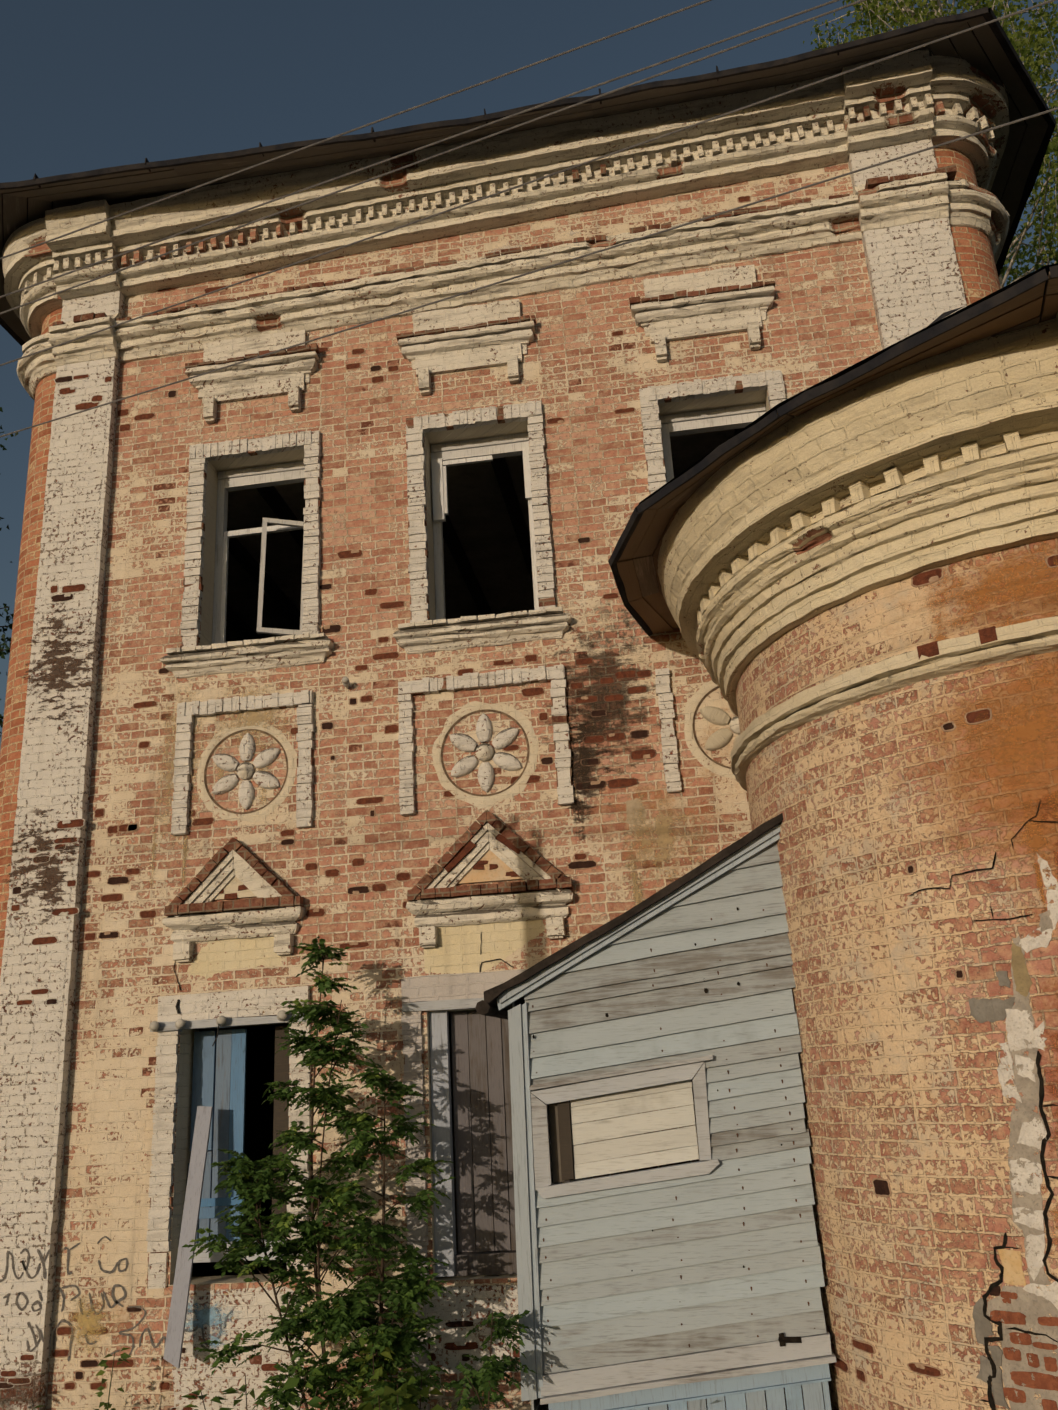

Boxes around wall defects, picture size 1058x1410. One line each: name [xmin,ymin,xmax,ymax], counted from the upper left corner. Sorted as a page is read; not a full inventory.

damp [22,608,97,726]
damp [570,725,590,839]
damp [4,809,80,924]
crack [909,799,1057,896]
crack [974,906,1033,921]
spalling [955,968,965,980]
peeling [997,1009,1047,1103]
flaking render [976,1117,1058,1410]
spalling [907,1362,944,1377]